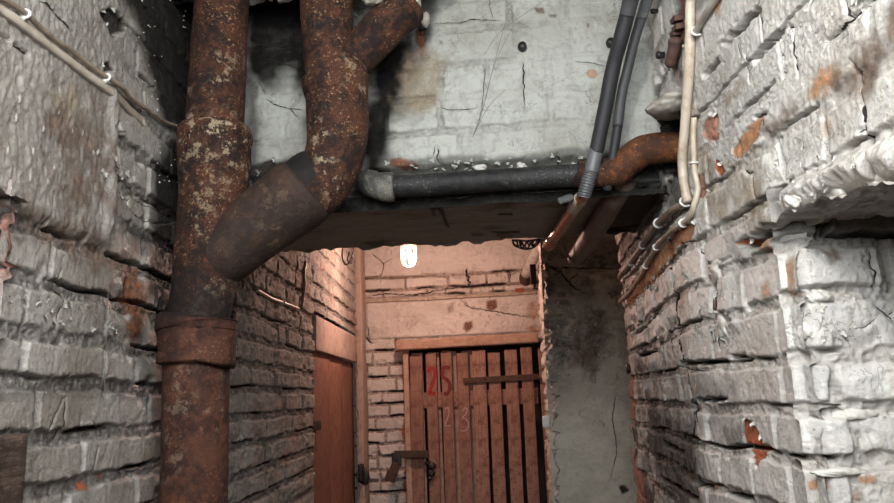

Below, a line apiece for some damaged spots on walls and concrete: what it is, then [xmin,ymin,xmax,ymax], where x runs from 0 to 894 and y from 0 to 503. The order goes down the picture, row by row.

crack [443,69,487,119]
spalling [703,111,719,146]
spalling [714,117,764,176]
crack [372,255,536,318]
flaking render [626,217,696,329]
crack [610,398,618,475]
spalling [742,415,777,465]